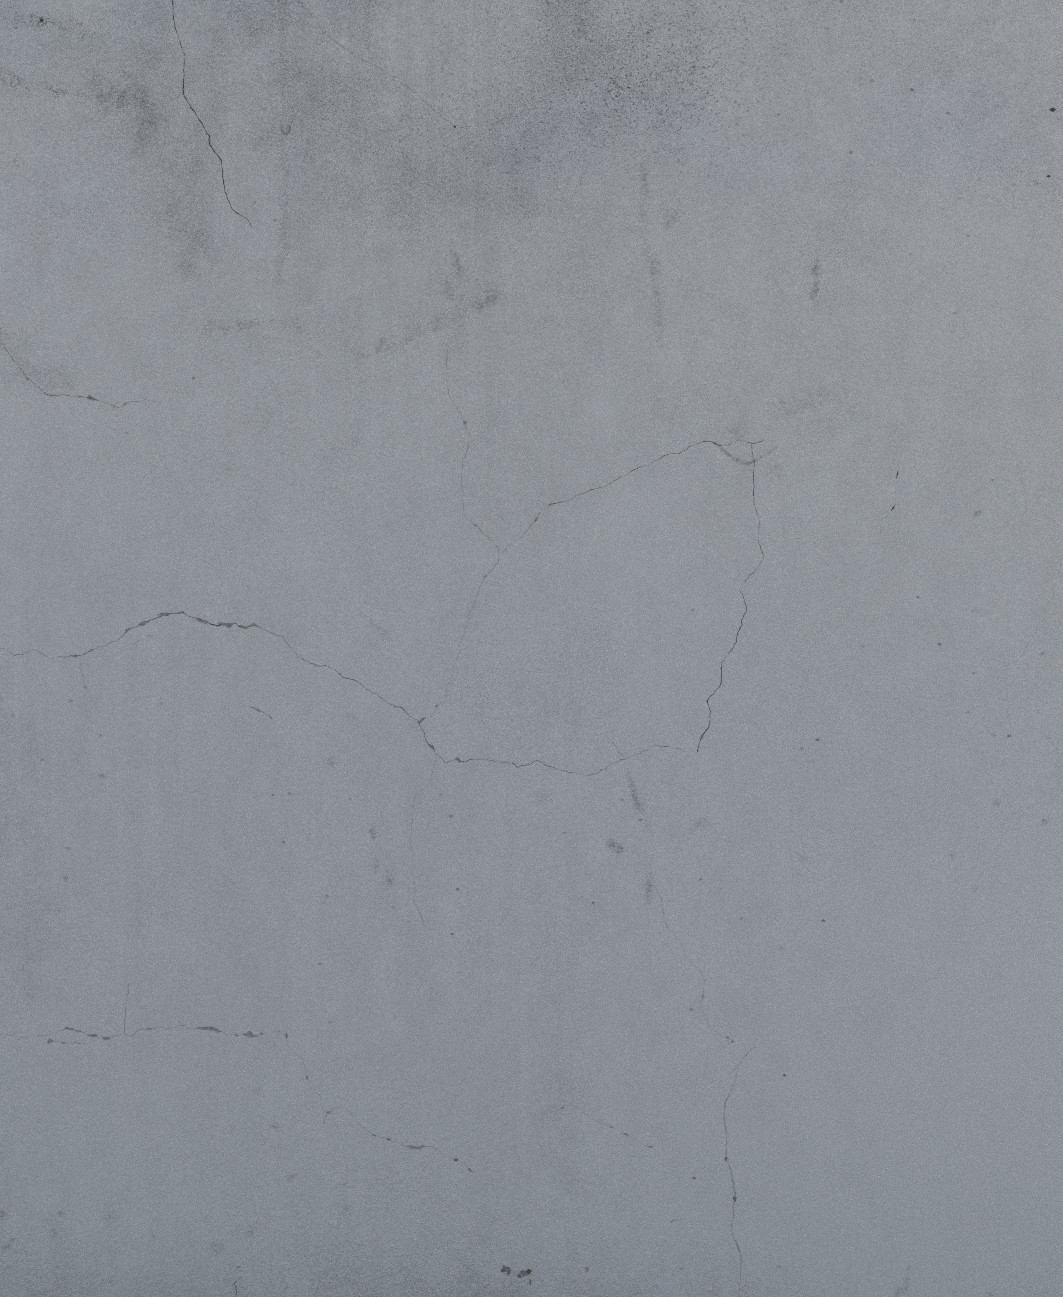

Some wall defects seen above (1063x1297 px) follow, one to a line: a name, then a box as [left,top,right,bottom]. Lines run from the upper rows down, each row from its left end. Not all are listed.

crack [172,0,251,225]
crack [0,342,156,408]
crack [11,391,764,919]
crack [21,983,472,1172]